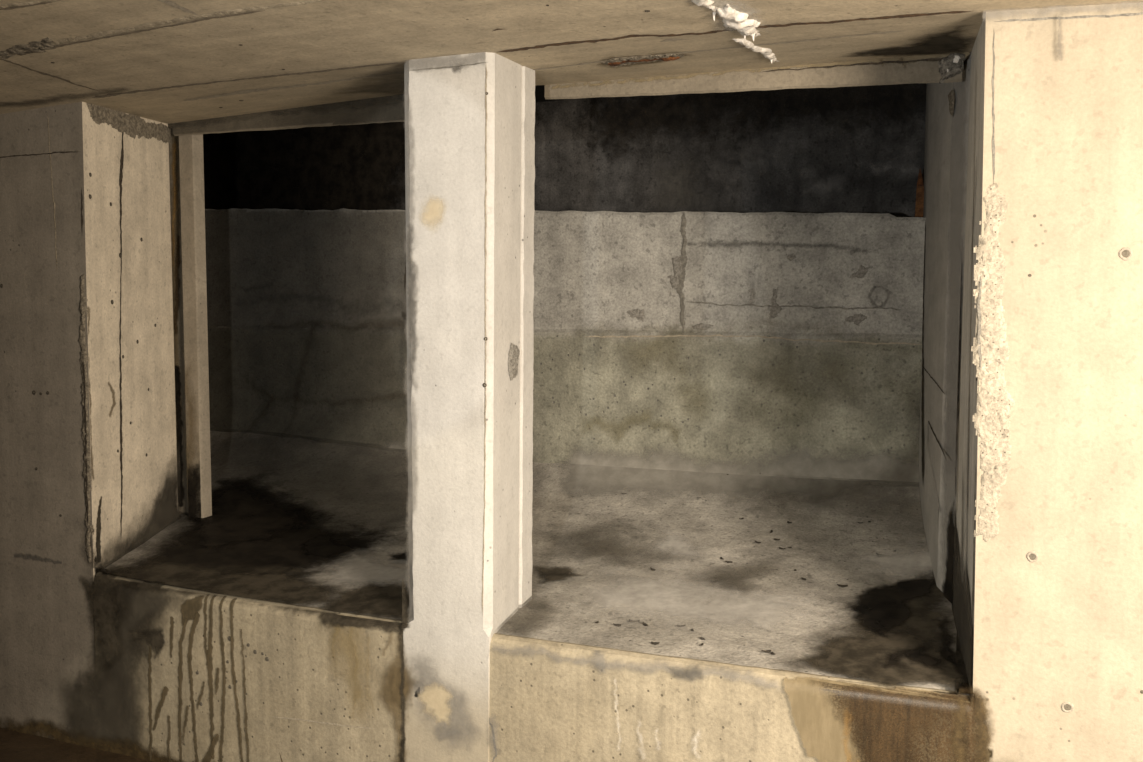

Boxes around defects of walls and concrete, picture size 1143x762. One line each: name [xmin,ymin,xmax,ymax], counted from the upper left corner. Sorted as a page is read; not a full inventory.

water stain [691,0,779,63]
water stain [851,30,973,84]
water stain [0,468,409,762]
water stain [598,571,783,623]
water stain [790,467,992,762]
water stain [419,686,451,721]